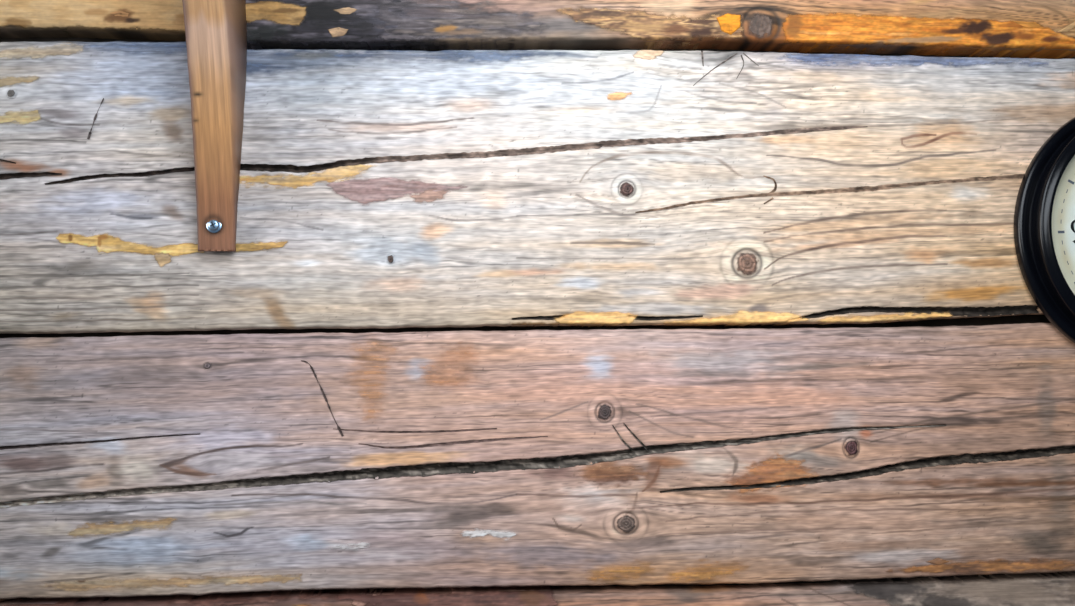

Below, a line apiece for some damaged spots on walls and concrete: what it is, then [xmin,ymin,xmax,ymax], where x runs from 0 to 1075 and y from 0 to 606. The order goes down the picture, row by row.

peeling [783,13,1075,59]
crack [0,159,195,185]
crack [240,126,868,173]
peeling [56,233,199,267]
peeling [236,241,287,252]
crack [0,360,947,508]
crack [660,446,1075,493]